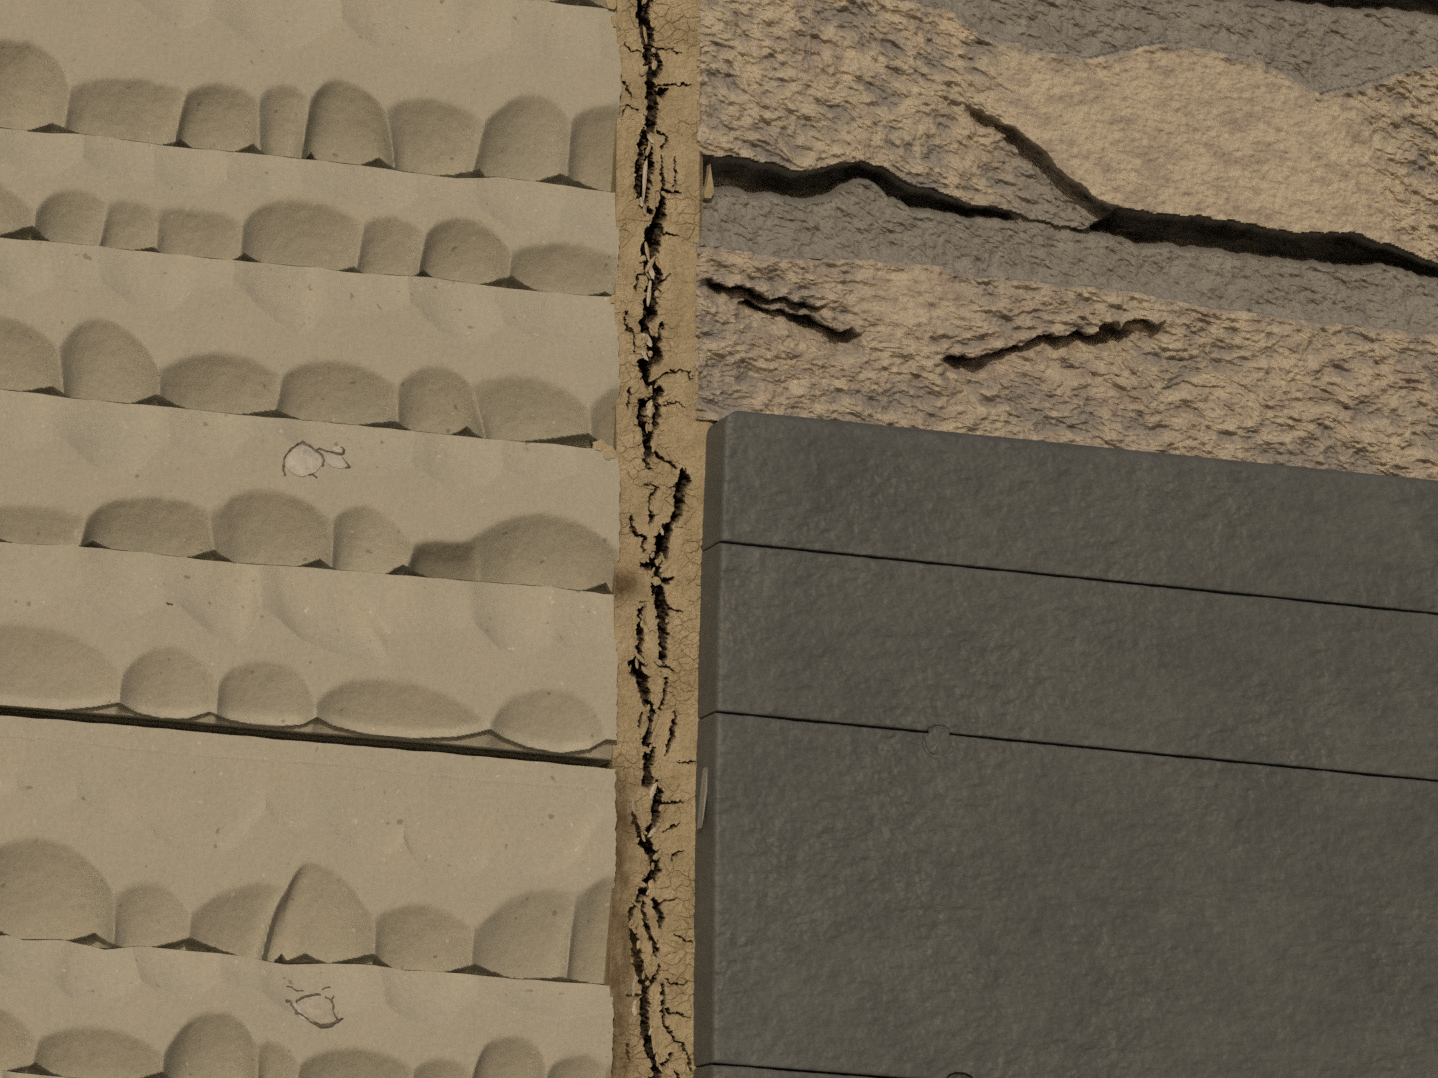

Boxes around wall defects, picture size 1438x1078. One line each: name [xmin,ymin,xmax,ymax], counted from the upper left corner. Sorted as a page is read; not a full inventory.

peeling [282,440,351,478]
crack [622,0,693,1078]
peeling [285,986,343,1028]